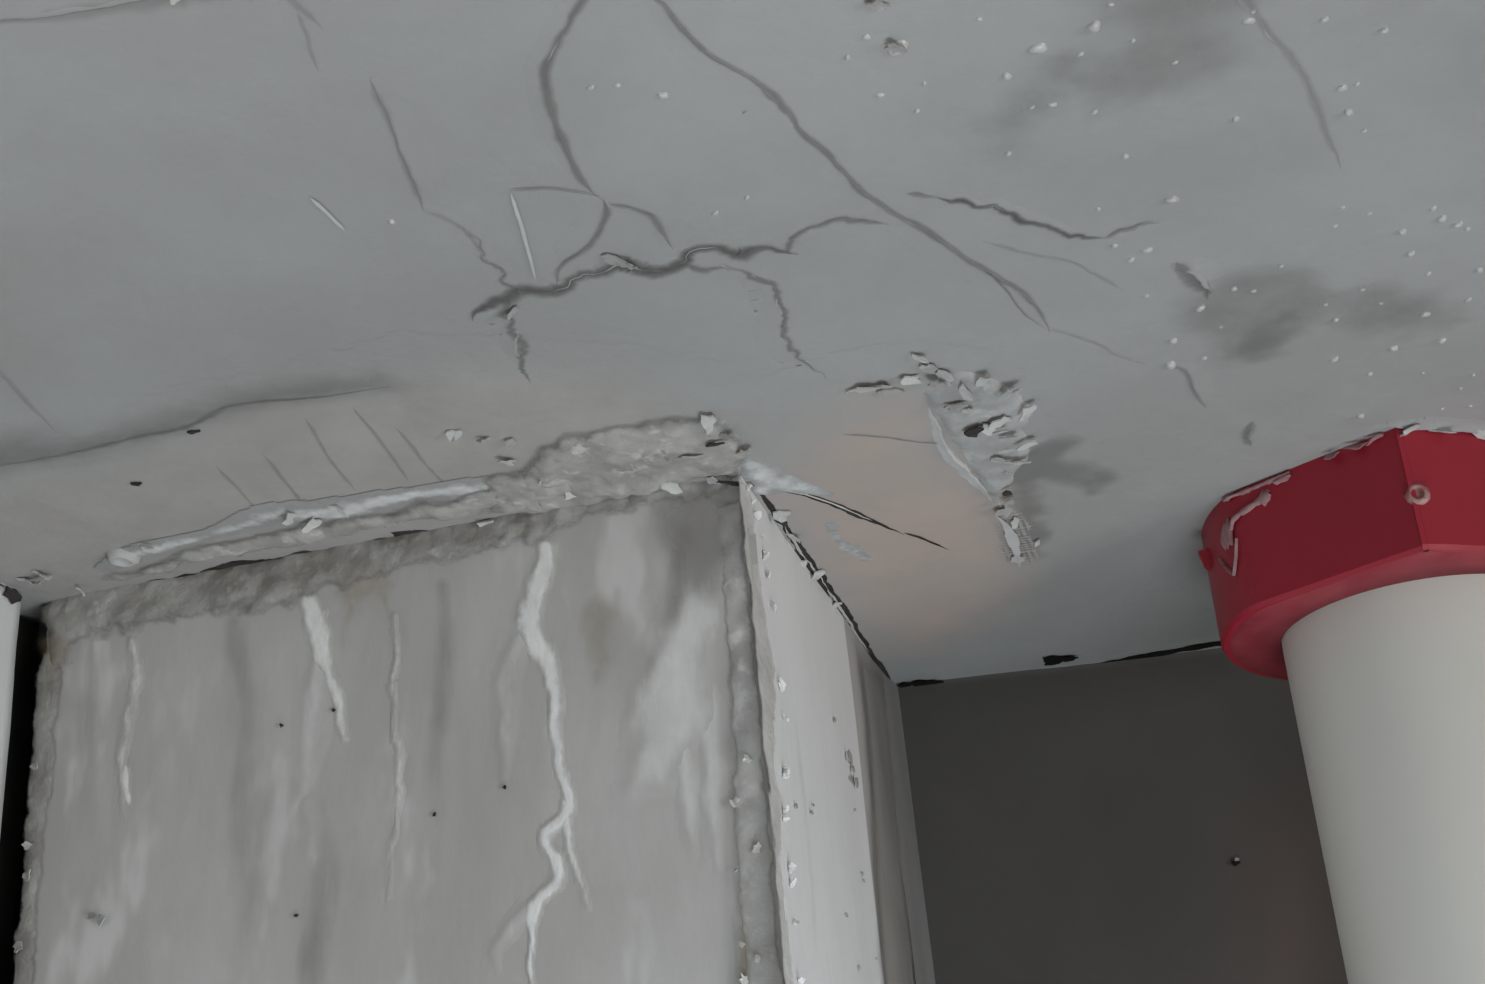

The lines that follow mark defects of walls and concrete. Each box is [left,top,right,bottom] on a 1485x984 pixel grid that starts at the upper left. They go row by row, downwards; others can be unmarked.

crack [462,0,884,382]
crack [912,194,1158,239]
crack [1171,257,1227,300]
crack [1188,0,1340,171]
leakage [78,630,146,851]
peeling [282,513,322,533]
leakage [286,591,352,977]
leakage [383,611,408,901]
leakage [487,535,593,984]
leakage [608,529,758,875]
flaking render [446,339,1115,984]
crack [750,482,891,680]